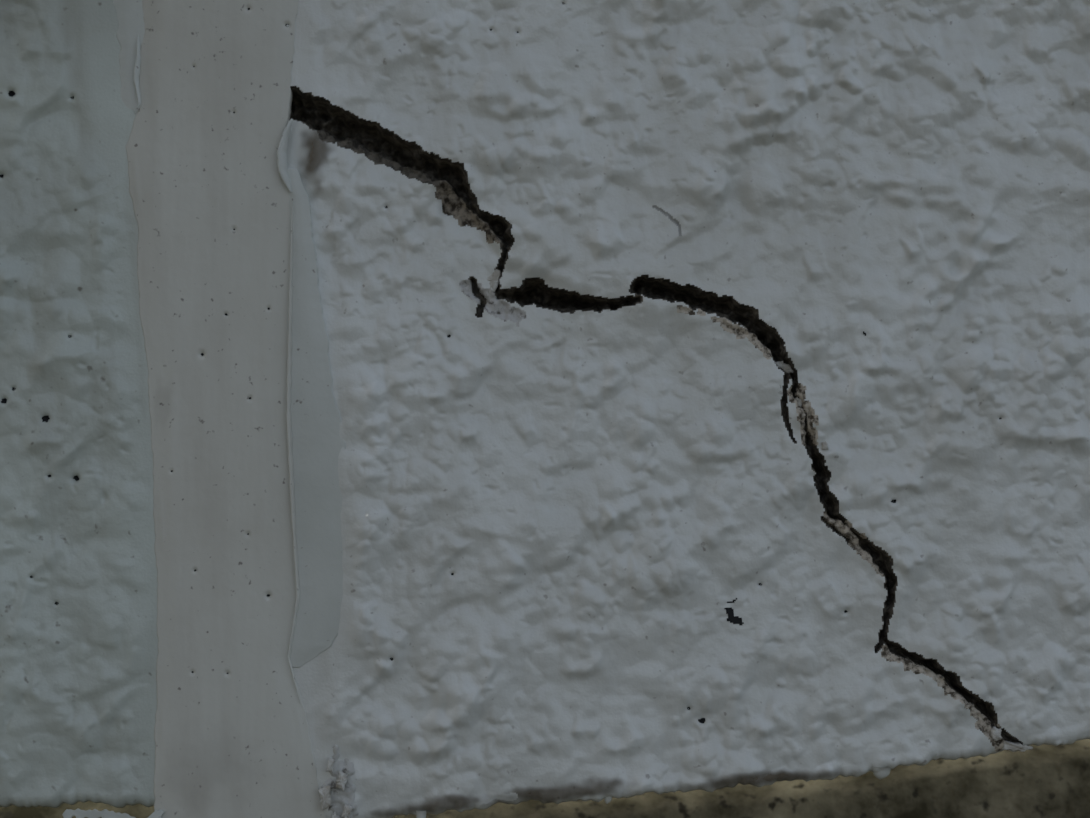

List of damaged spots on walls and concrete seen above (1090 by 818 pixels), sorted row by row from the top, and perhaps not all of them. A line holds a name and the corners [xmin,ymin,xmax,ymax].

crack [289,86,1033,752]